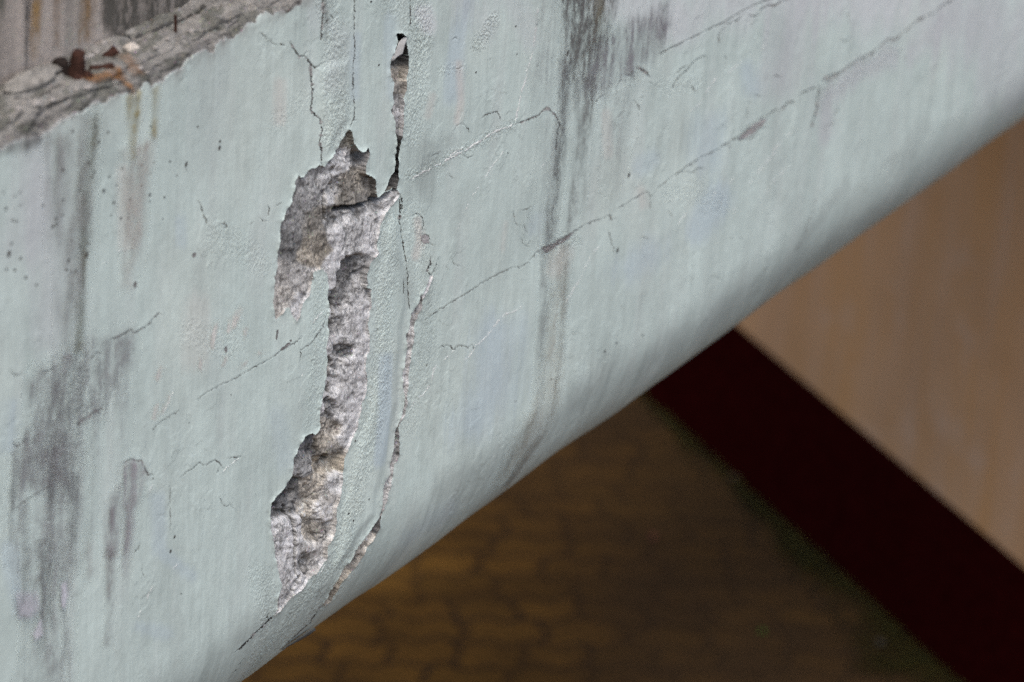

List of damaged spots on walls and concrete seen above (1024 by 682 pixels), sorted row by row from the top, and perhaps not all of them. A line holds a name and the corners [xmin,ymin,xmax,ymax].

crack [261,0,356,164]
damp [556,0,668,190]
spalling [270,130,400,615]
crack [286,0,952,645]
damp [107,461,144,592]